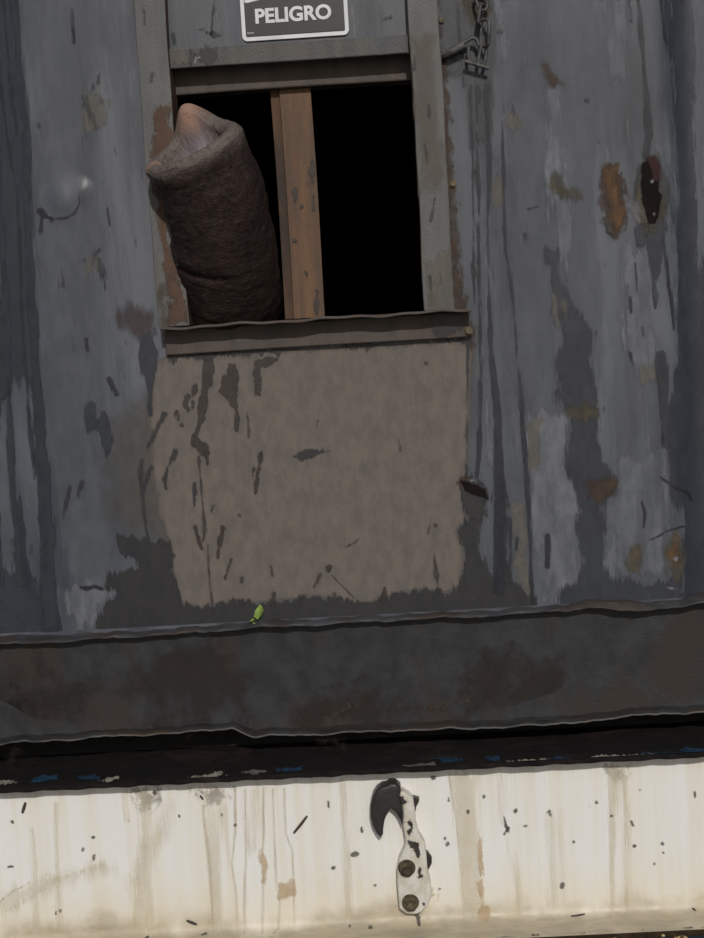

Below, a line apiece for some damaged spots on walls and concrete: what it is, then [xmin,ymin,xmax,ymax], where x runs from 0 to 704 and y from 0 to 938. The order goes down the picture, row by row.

corrosion [149,105,173,162]
peeling [545,83,572,277]
corrosion [599,163,628,238]
corrosion [117,183,188,338]
peeling [664,217,678,310]
peeling [621,242,657,382]
peeling [505,406,581,604]
peeling [603,447,670,580]
peeling [63,577,117,630]
peeling [78,774,119,782]
peeling [241,765,303,775]